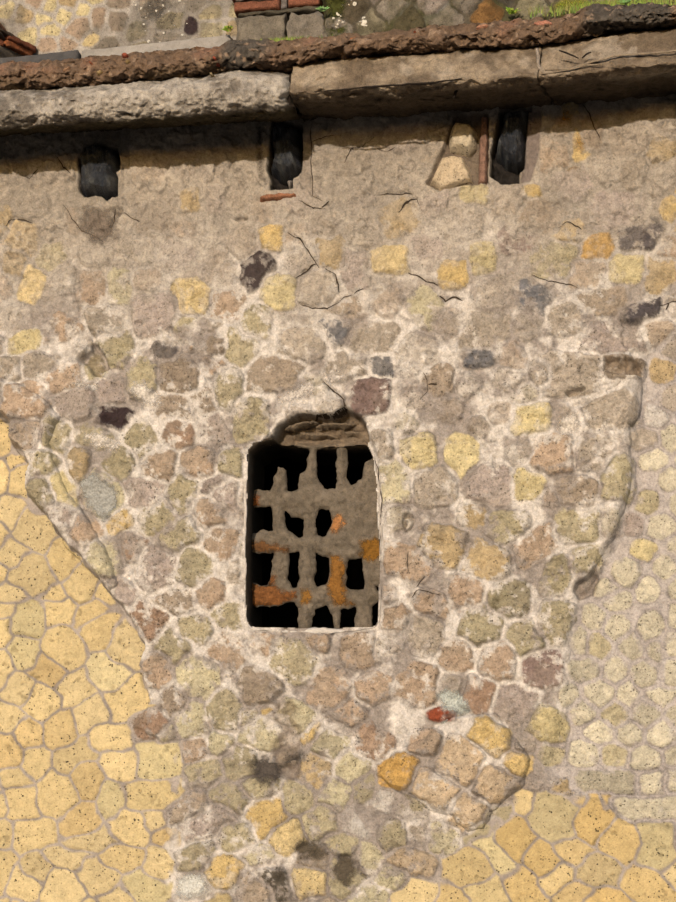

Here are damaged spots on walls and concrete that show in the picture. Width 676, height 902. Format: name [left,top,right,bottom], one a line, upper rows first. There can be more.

crack [299,129,395,209]
crack [381,193,419,212]
crack [288,233,362,309]
crack [408,272,463,302]
spalling [73,340,110,378]
spalling [563,385,587,398]
spalling [260,407,370,447]
spalling [401,511,415,534]
spalling [571,557,601,602]
spalling [268,697,304,785]